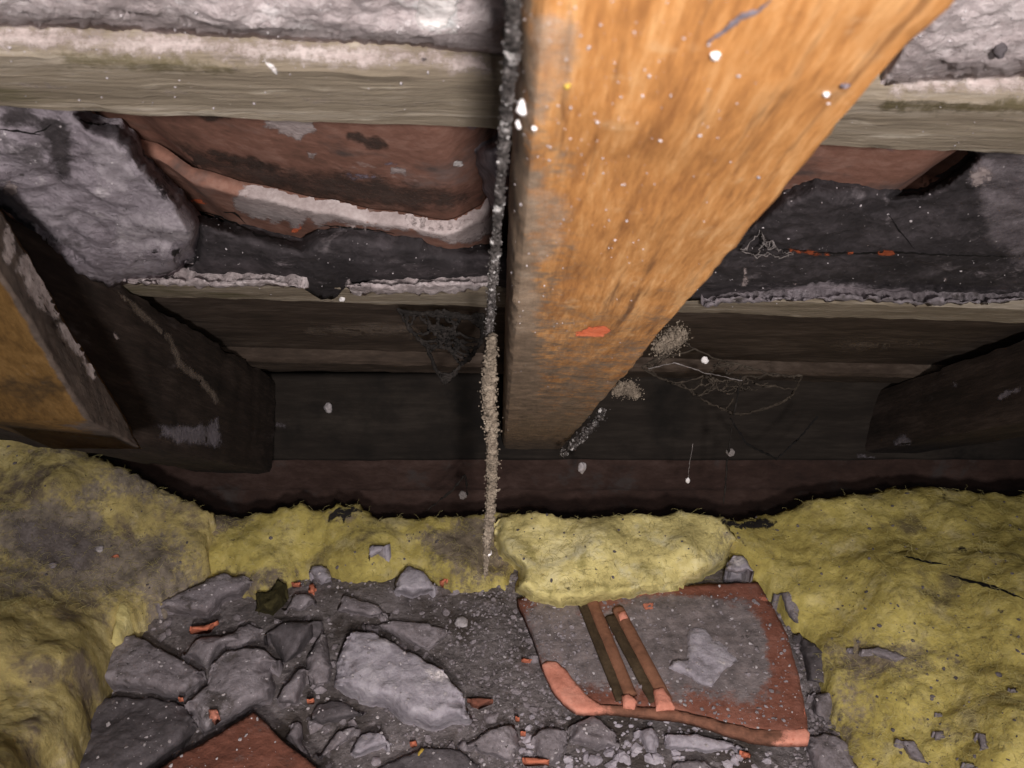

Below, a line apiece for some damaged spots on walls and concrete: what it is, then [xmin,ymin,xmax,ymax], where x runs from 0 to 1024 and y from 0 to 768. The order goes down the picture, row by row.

crack [751,214,1021,257]